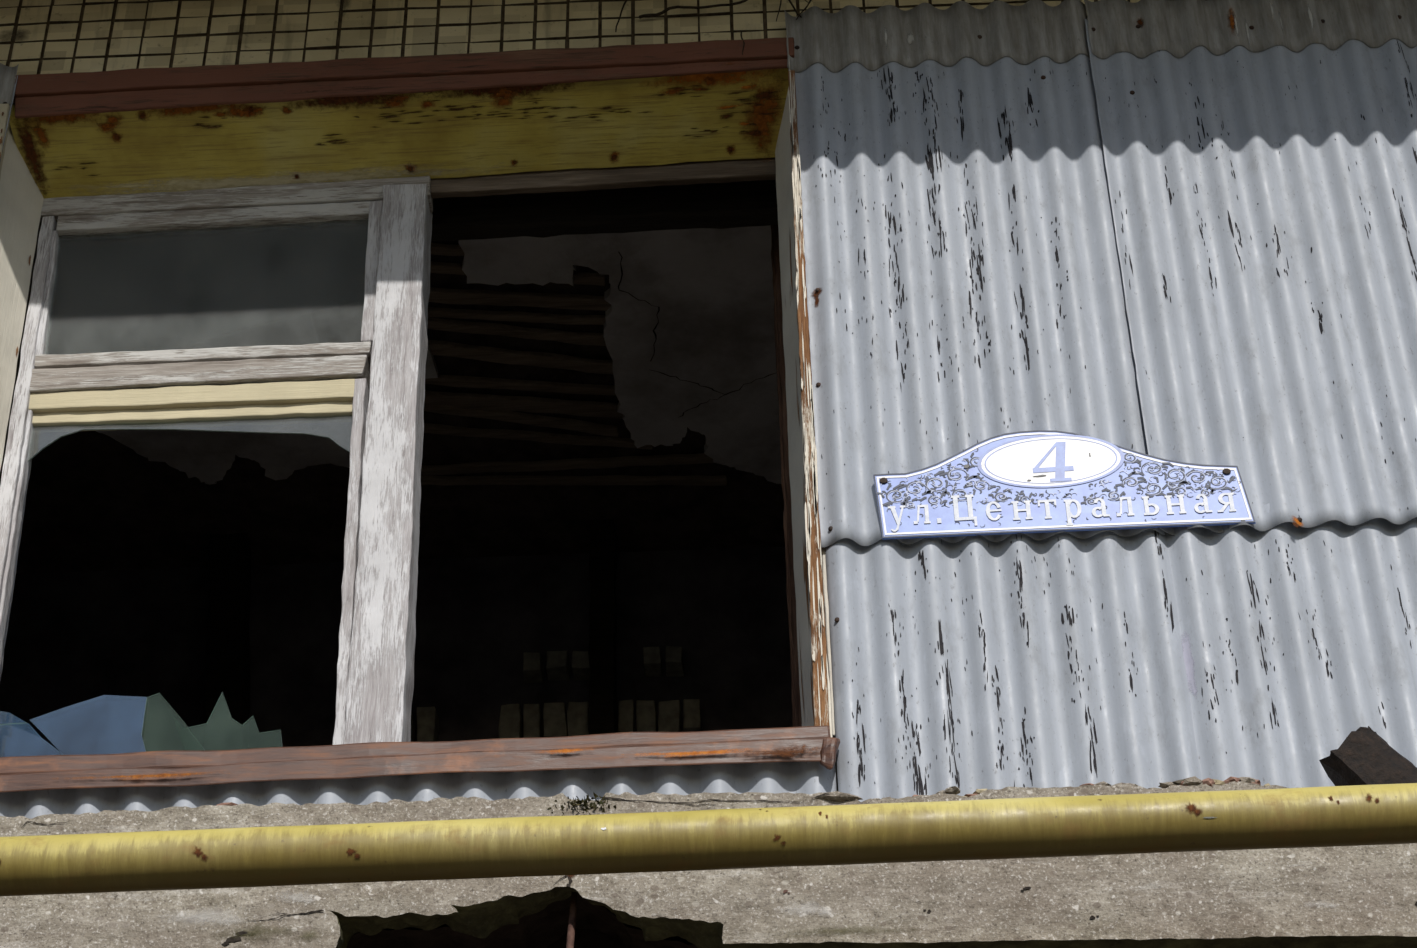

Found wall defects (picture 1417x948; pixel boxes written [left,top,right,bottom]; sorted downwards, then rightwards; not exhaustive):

rust [18,113,121,194]
rust [139,104,264,120]
rust [283,83,573,114]
crack [618,252,775,417]
peeling [684,55,850,737]
peeling [1008,184,1082,374]
peeling [1197,196,1292,296]
peeling [816,647,875,802]
peeling [886,596,1035,795]
peeling [1061,604,1101,775]
peeling [1242,570,1284,736]
spalling [331,887,724,948]